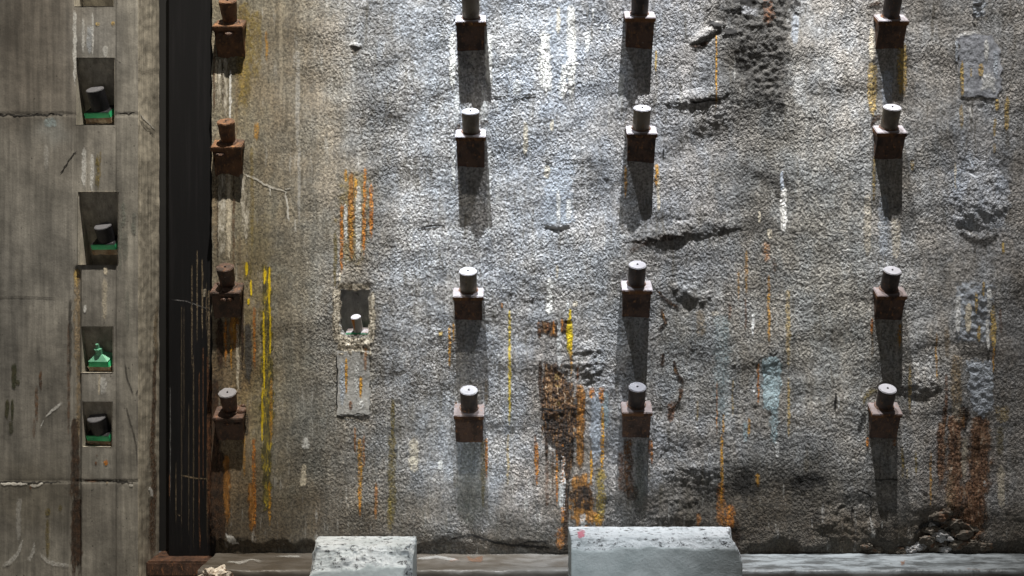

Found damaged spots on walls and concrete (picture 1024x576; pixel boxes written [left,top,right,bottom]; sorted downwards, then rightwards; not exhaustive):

crack [245,174,290,219]
rust [333,169,373,286]
rust [199,262,275,546]
rust [534,309,607,549]
rust [720,437,735,527]
water stain [753,353,782,439]
spalling [860,508,993,554]
rust [935,330,1005,540]